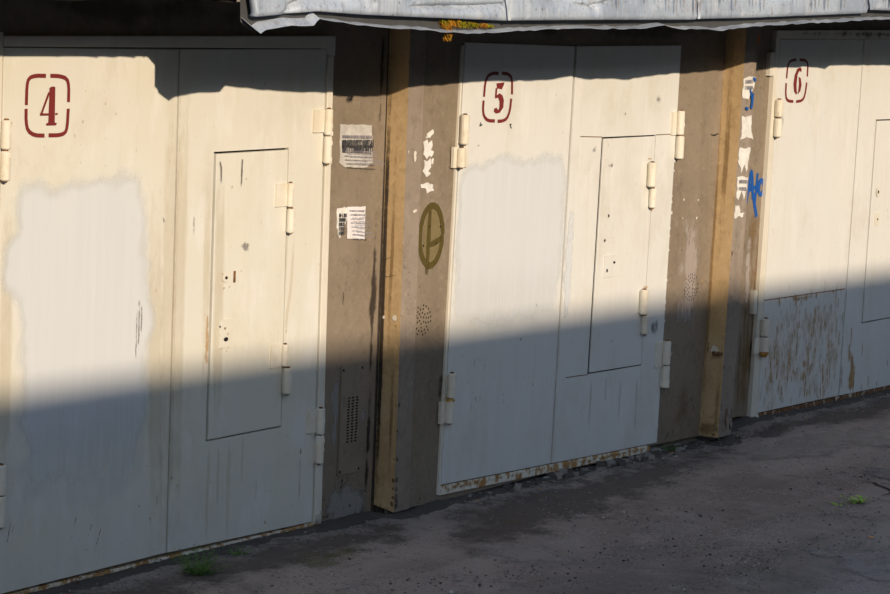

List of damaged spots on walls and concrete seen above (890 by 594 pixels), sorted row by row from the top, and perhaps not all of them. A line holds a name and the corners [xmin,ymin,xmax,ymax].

rust [759,322,835,402]